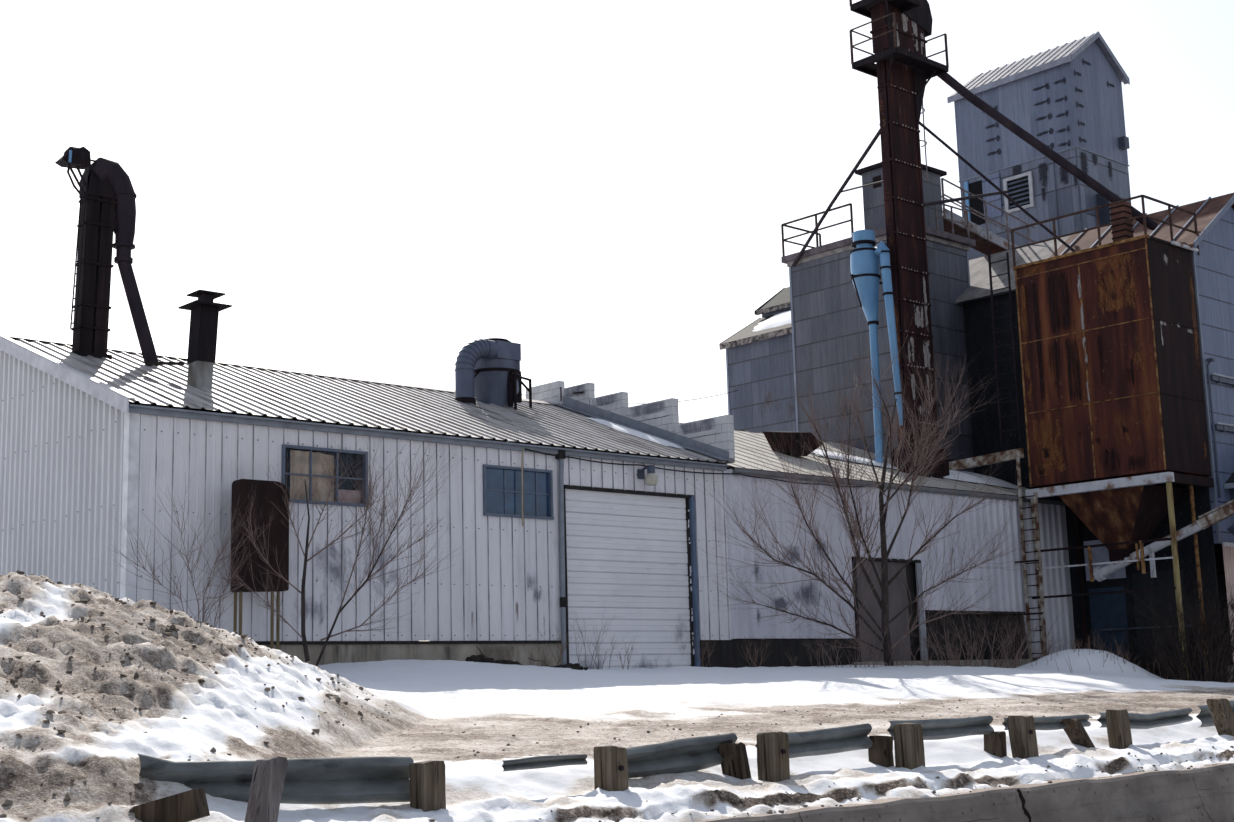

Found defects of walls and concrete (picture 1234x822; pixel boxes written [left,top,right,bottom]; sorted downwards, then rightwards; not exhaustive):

rust [1020,266,1083,401]
crack [968,788,1031,822]